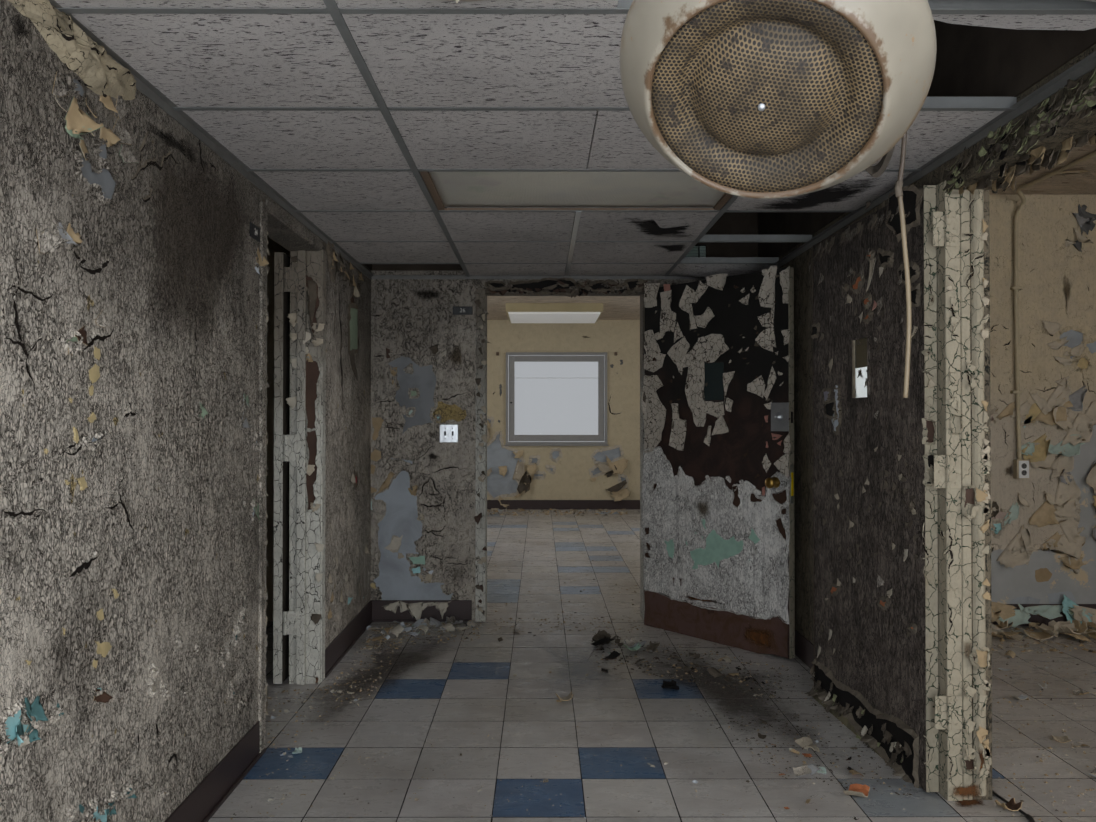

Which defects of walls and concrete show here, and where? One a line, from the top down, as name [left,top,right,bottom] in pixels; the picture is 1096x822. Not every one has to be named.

peeling [52,70,139,207]
peeling [943,67,1096,195]
crack [3,231,114,392]
crack [68,550,100,577]
peeling [286,241,364,513]
peeling [354,414,457,620]
peeling [429,265,791,624]
peeling [809,185,934,343]
peeling [810,363,978,562]
peeling [961,321,1096,627]
peeling [0,696,64,755]
peeling [804,623,919,788]